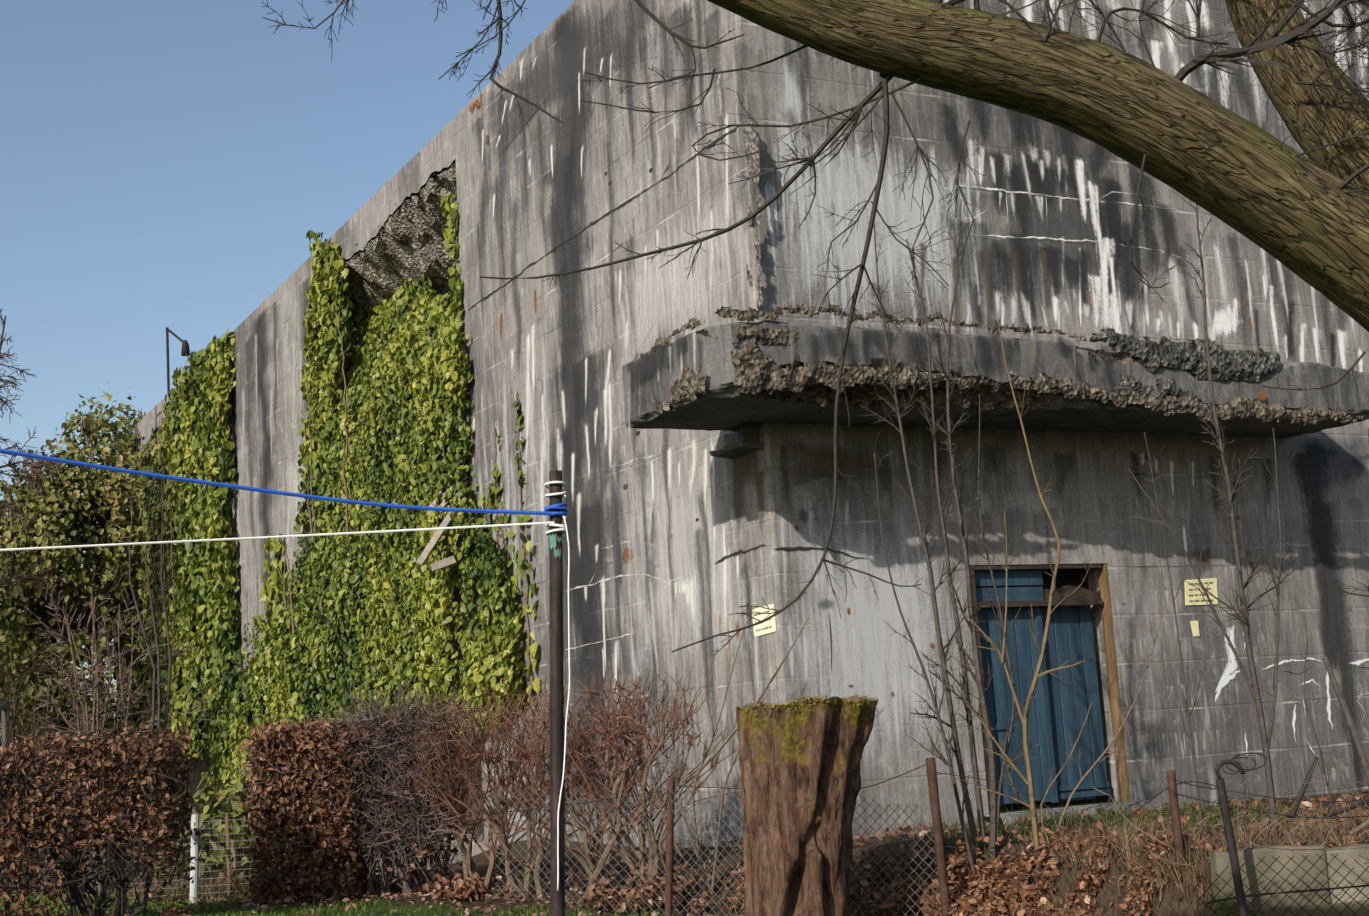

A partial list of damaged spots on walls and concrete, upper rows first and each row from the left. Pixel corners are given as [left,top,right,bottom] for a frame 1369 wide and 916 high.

water stain [477,0,763,820]
water stain [780,442,950,756]
spalling [638,119,1363,426]
water stain [765,40,1363,386]
water stain [1007,0,1261,127]
water stain [1133,453,1174,495]
water stain [1262,442,1369,789]
water stain [1332,0,1368,98]